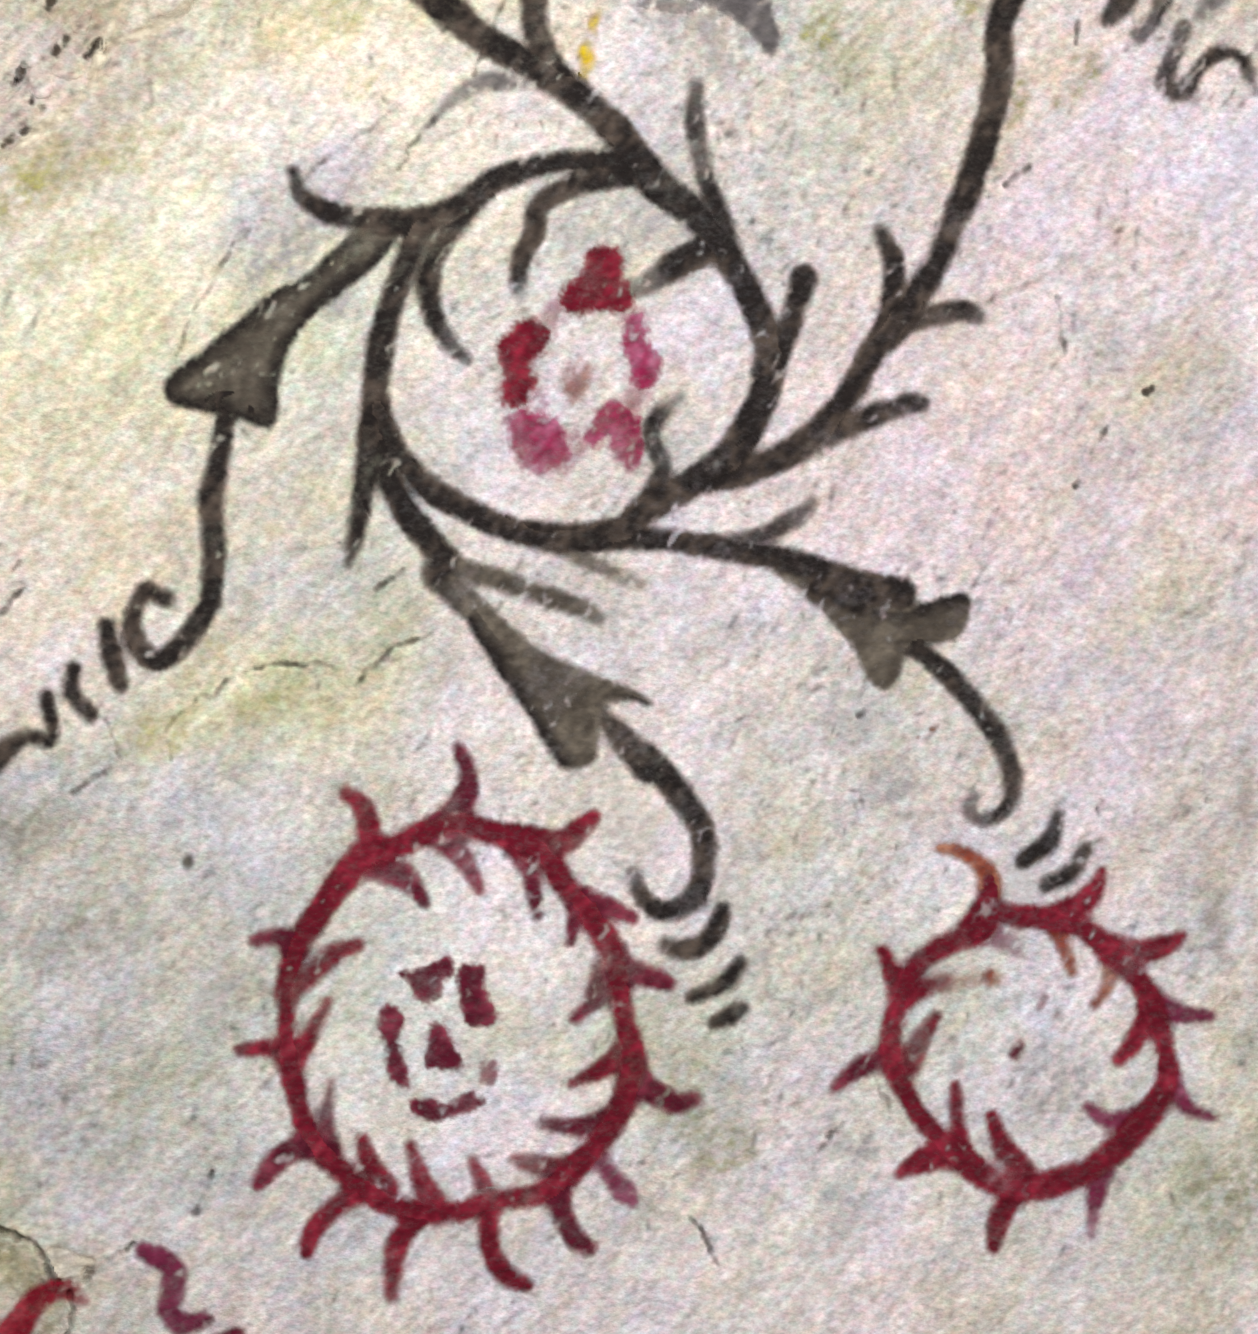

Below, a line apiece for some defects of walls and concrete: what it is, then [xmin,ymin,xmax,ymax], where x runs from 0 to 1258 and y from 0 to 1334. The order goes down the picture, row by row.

flaking render [0,0,198,170]